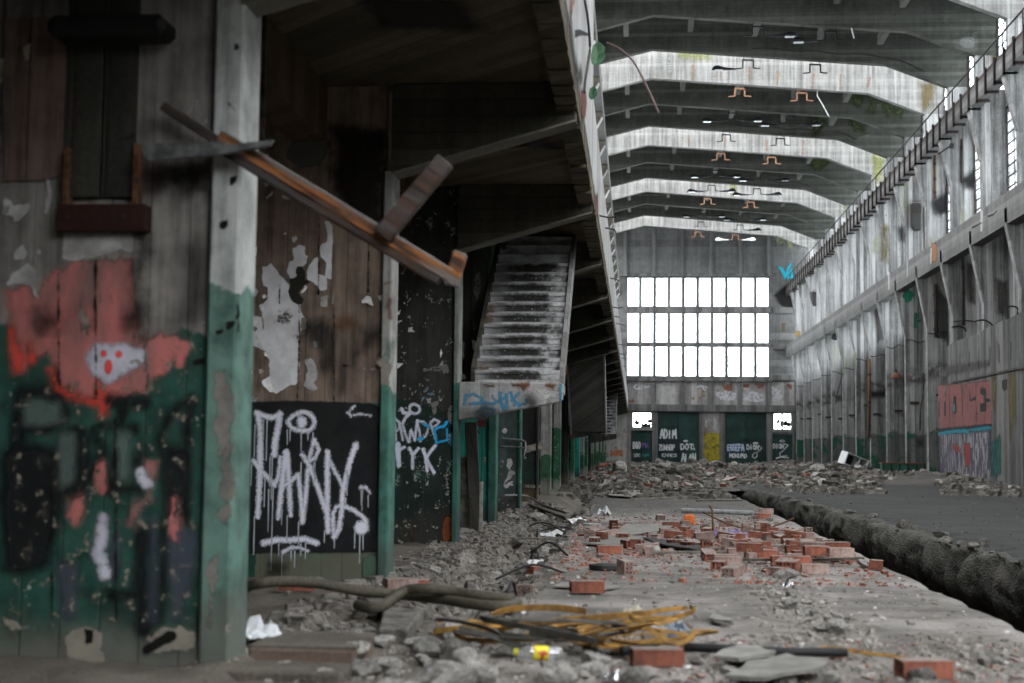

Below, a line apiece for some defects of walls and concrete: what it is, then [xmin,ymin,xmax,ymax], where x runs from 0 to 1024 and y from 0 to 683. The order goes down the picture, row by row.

peeling [2,179,53,223]
peeling [6,244,42,299]
peeling [253,221,334,394]
peeling [59,404,196,454]
peeling [176,342,236,525]